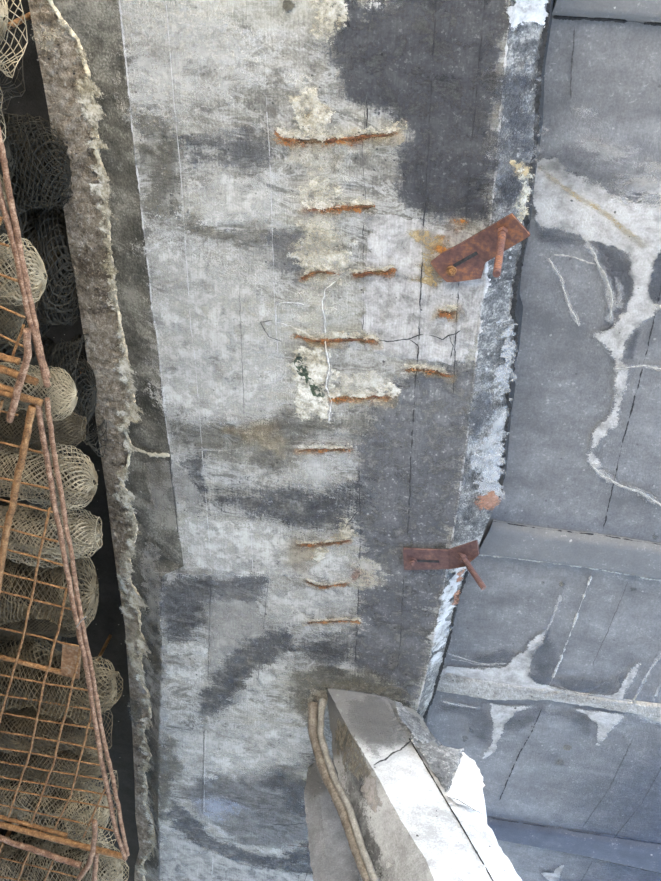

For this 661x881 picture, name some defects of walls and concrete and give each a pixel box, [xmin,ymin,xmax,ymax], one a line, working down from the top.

water stain [308,0,348,43]
peeling [506,0,549,29]
spalling [274,124,399,151]
spalling [302,196,375,215]
water stain [514,167,541,224]
spalling [299,262,397,281]
corrosion [409,219,467,288]
water stain [648,254,661,300]
spalling [294,329,379,347]
water stain [47,0,308,881]
corrosion [452,568,465,605]
water stain [283,654,428,723]